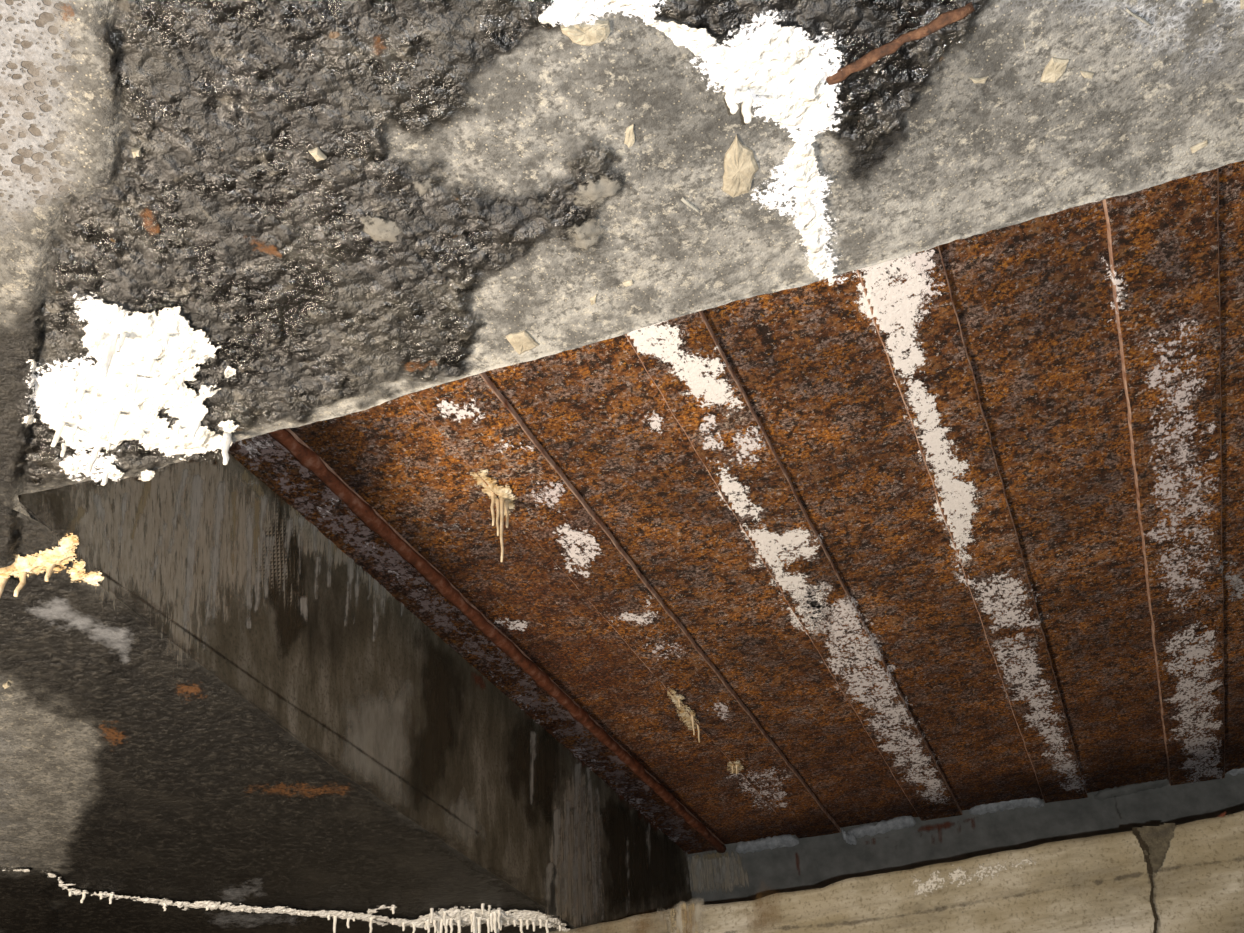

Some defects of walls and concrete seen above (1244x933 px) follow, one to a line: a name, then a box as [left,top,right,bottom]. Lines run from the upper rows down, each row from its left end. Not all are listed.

leakage [532,0,848,286]
leakage [848,136,899,180]
leakage [0,292,749,933]
crack [1149,874,1158,933]